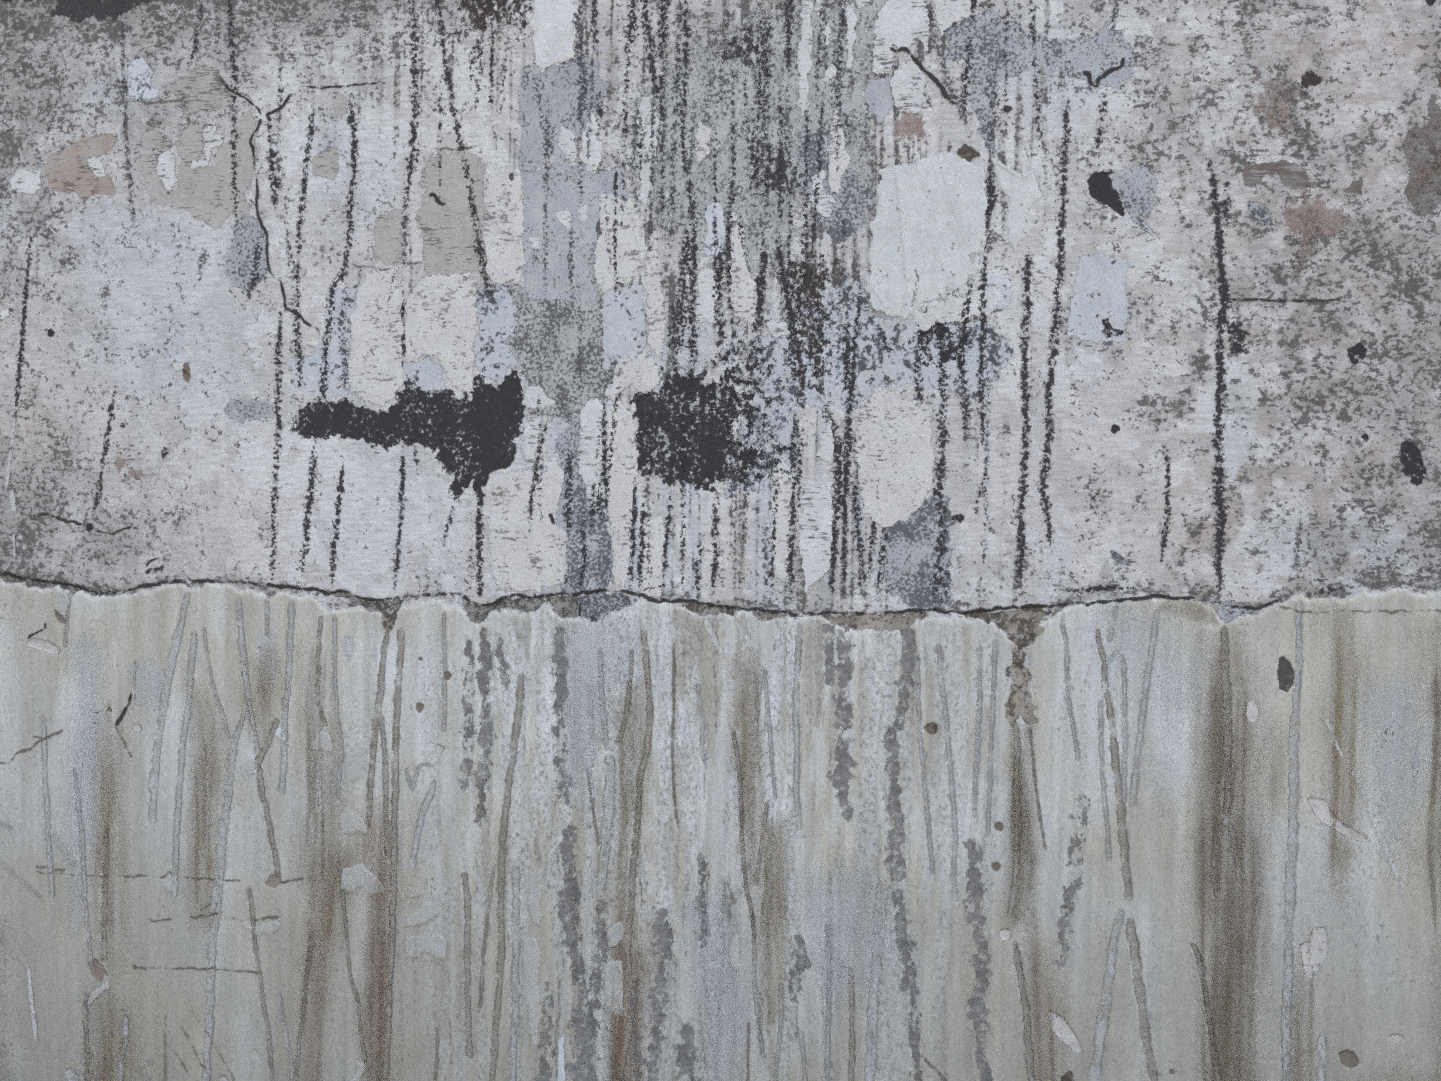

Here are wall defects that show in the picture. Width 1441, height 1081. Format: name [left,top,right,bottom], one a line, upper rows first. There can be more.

spalling [51,0,150,27]
peeling [10,133,116,200]
crack [220,79,379,335]
peeling [1087,162,1159,234]
spalling [223,0,1135,1081]
crack [0,512,1441,617]
spalling [1048,605,1175,1081]